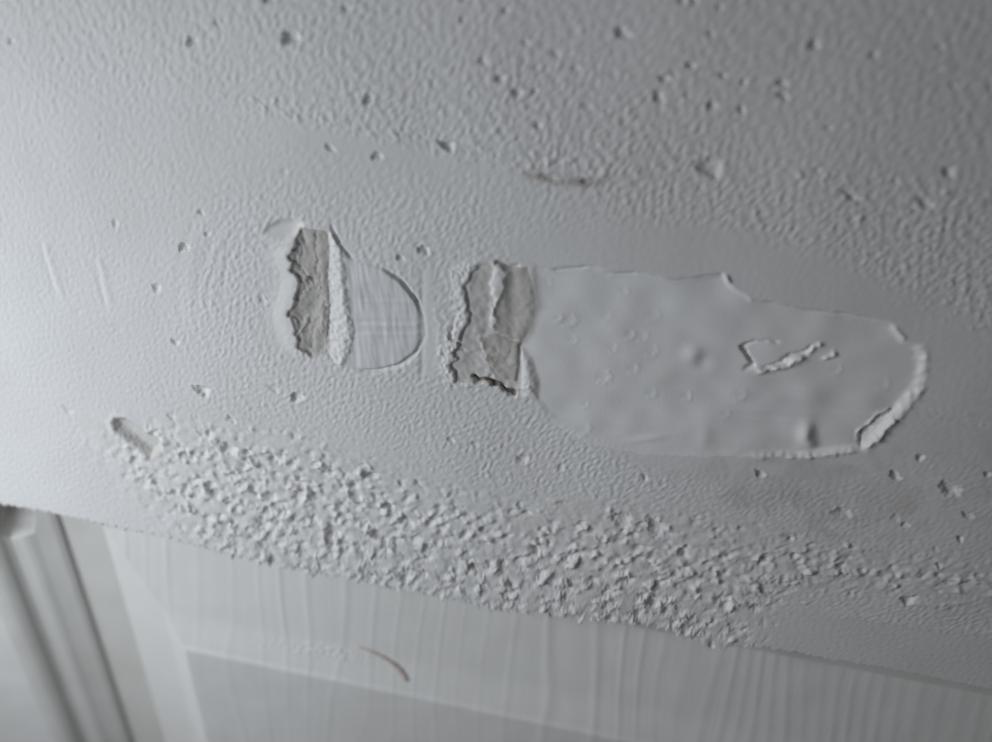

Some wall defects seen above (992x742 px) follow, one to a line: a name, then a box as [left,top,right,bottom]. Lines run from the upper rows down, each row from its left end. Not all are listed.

peeling [258,215,420,373]
peeling [443,260,927,480]